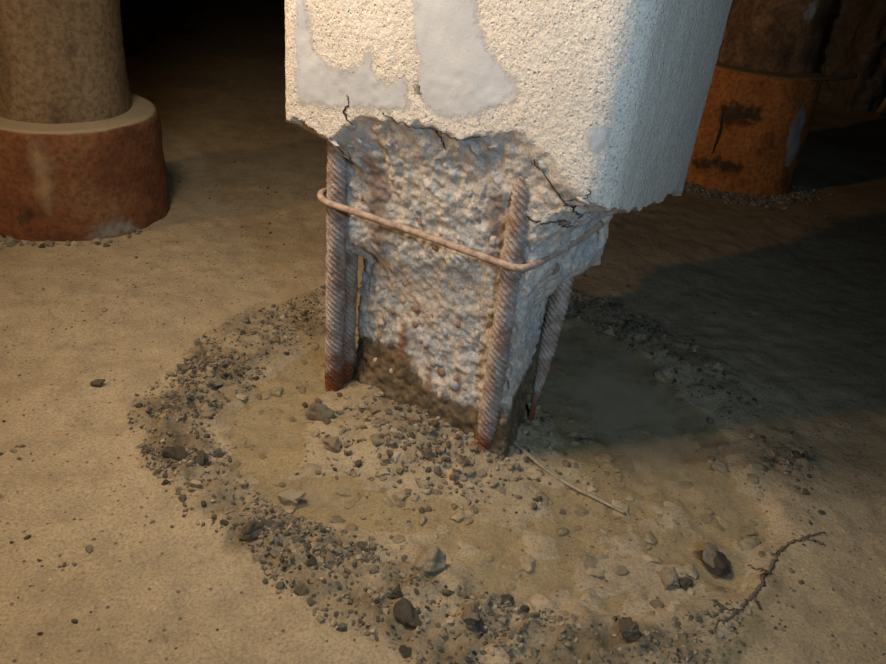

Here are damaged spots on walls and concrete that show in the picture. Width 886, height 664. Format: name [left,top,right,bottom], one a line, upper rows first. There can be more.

corrosion [368,162,388,246]
crack [383,113,486,149]
spalling [286,0,658,426]
crack [525,159,591,228]
leakage [692,156,742,173]
peeling [786,106,805,167]
crack [714,532,826,632]